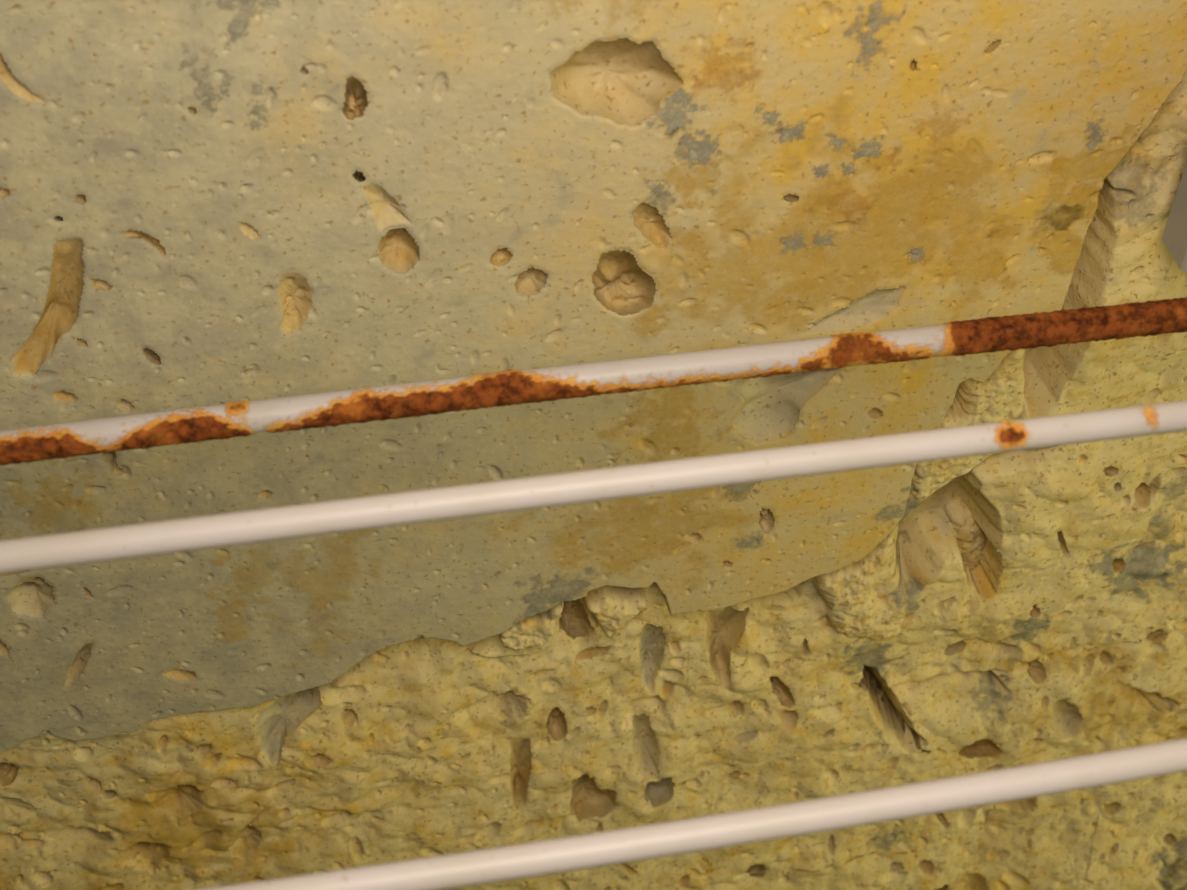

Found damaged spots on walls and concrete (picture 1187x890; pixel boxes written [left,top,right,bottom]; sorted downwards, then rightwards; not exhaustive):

spalling [1062,71,1187,310]
spalling [629,200,675,254]
spalling [275,268,318,340]
spalling [488,247,551,299]
spalling [588,247,660,319]
spalling [797,284,911,336]
spalling [141,346,163,367]
corrosion [0,297,1187,466]
spalling [728,367,848,448]
spalling [938,332,1187,429]
spalling [0,431,1187,890]